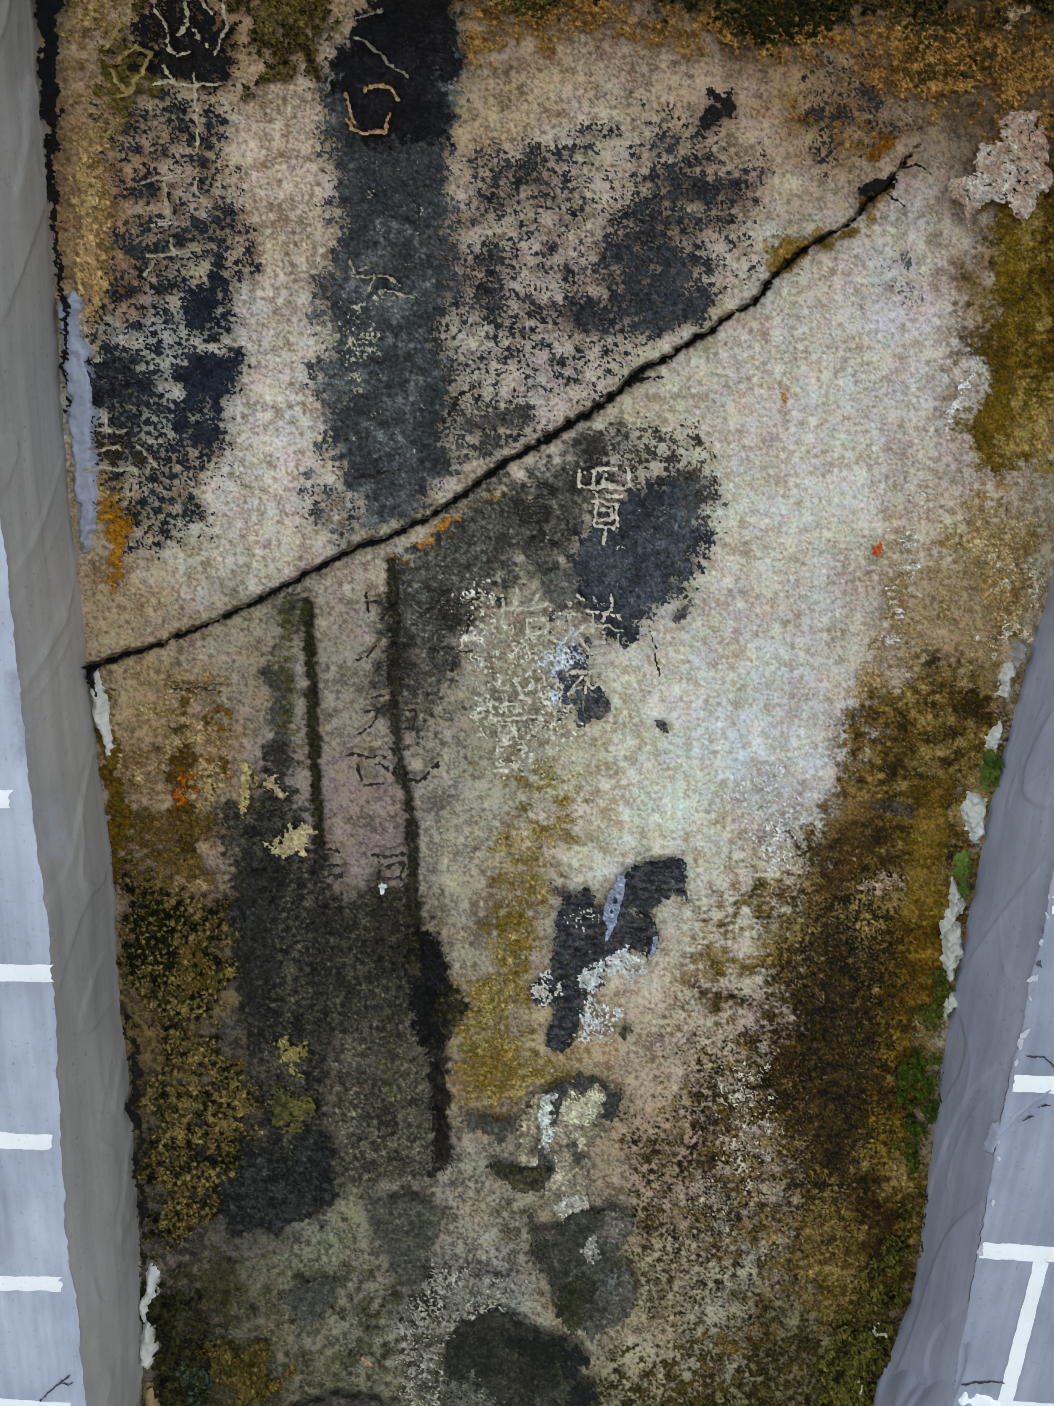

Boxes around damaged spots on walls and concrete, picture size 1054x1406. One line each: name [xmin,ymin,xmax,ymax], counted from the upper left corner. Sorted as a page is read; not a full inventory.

water stain [46,0,126,414]
water stain [74,444,141,602]
water stain [94,418,632,1313]
crack [81,144,931,697]
water stain [448,0,1054,1406]
water stain [387,1253,531,1406]